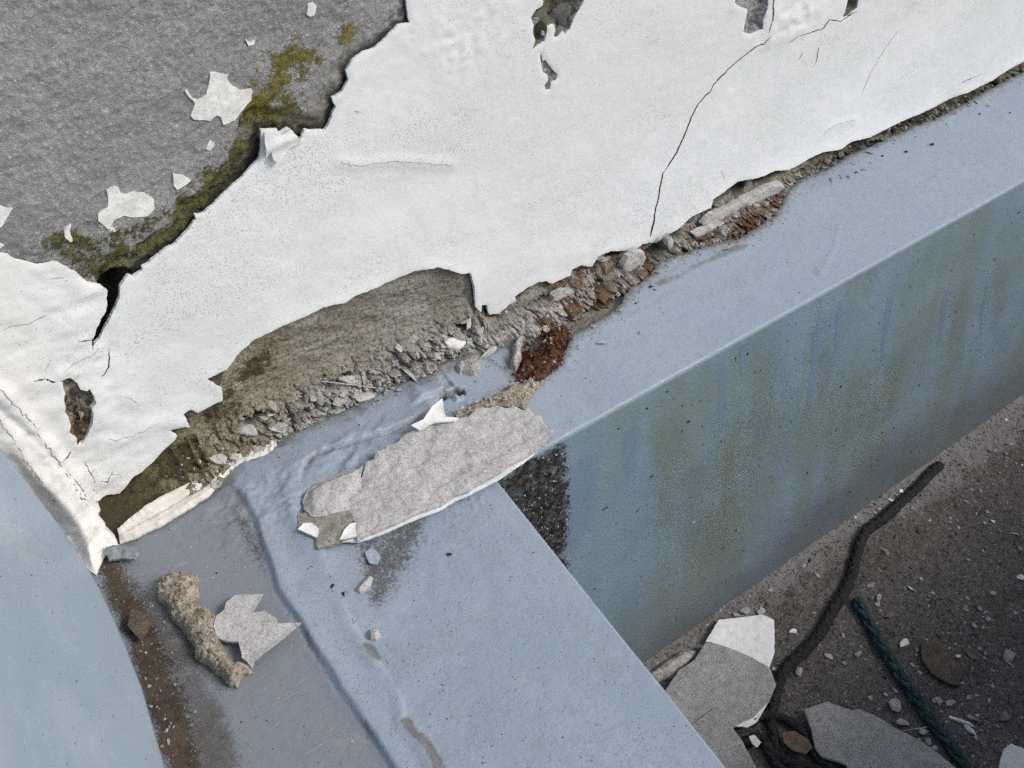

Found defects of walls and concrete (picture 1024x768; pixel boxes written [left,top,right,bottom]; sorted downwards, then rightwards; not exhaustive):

spalling [531,0,582,90]
spalling [735,0,768,34]
crack [647,0,857,244]
spalling [0,0,408,341]
spalling [98,155,836,545]
rust [512,320,573,384]
spalling [62,378,94,441]